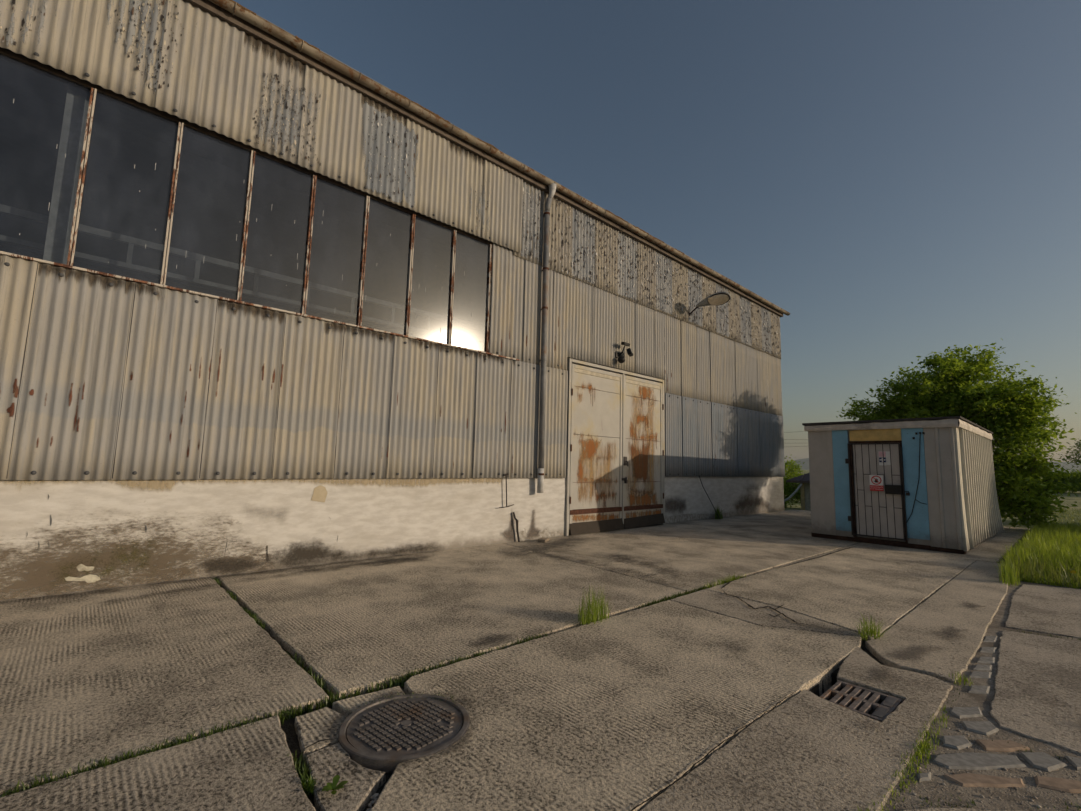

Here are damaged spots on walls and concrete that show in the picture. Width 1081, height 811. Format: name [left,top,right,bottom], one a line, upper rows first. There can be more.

peeling [107,0,184,94]
peeling [254,70,327,166]
peeling [363,103,419,208]
peeling [521,181,781,356]
rust [7,379,47,417]
rust [69,383,85,432]
rust [572,386,661,521]
leakage [0,521,435,603]
crack [721,581,840,632]
crack [780,546,855,568]